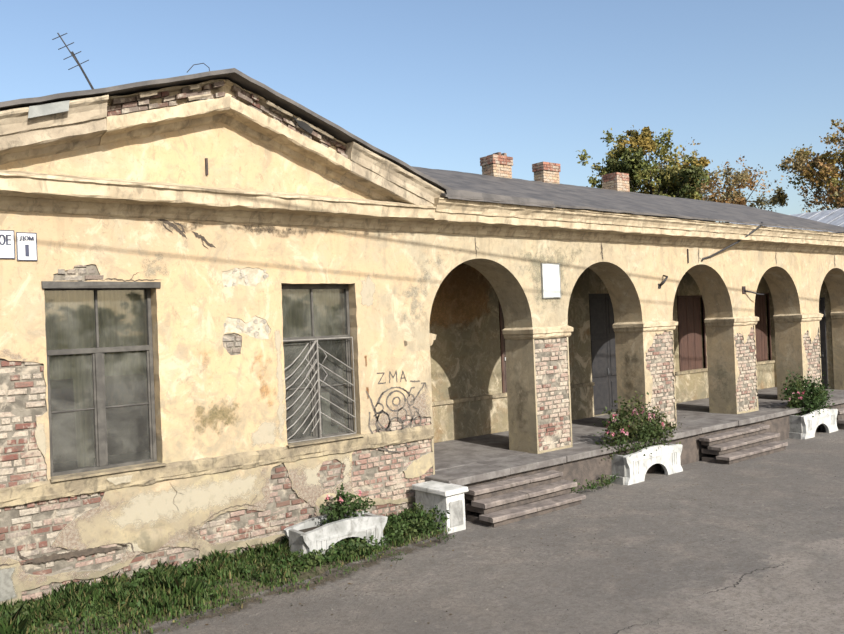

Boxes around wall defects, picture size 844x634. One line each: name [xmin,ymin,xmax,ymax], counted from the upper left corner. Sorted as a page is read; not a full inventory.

spalling [53,264,104,281]
crack [157,219,216,248]
peeling [222,267,269,287]
spalling [0,356,48,488]
peeling [223,315,285,446]
spalling [371,391,431,433]
spalling [534,337,571,451]
spalling [645,331,677,426]
spalling [734,325,758,412]
spalling [803,327,822,393]
spalling [0,439,433,602]